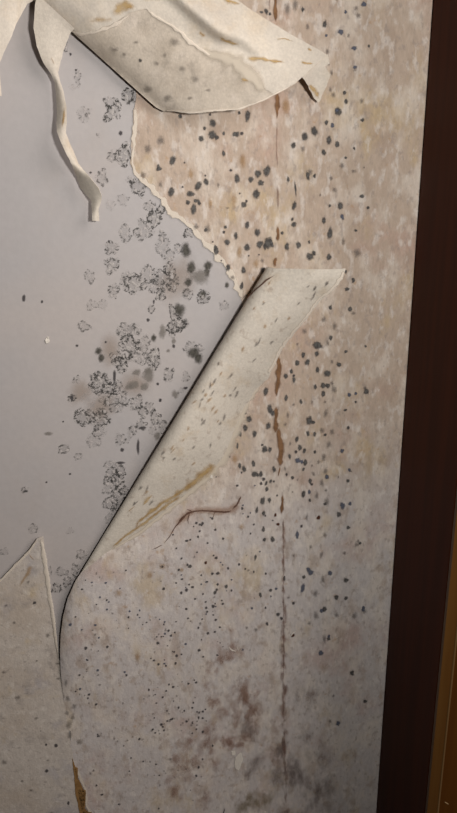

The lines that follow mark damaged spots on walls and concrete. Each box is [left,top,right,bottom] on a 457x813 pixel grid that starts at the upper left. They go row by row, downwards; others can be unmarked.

damp [103,87,135,122]
damp [199,113,243,141]
damp [322,91,348,155]
damp [108,131,131,167]
damp [230,166,270,207]
damp [244,222,316,259]
damp [68,175,211,453]
damp [102,462,129,513]
peeling [72,759,92,813]